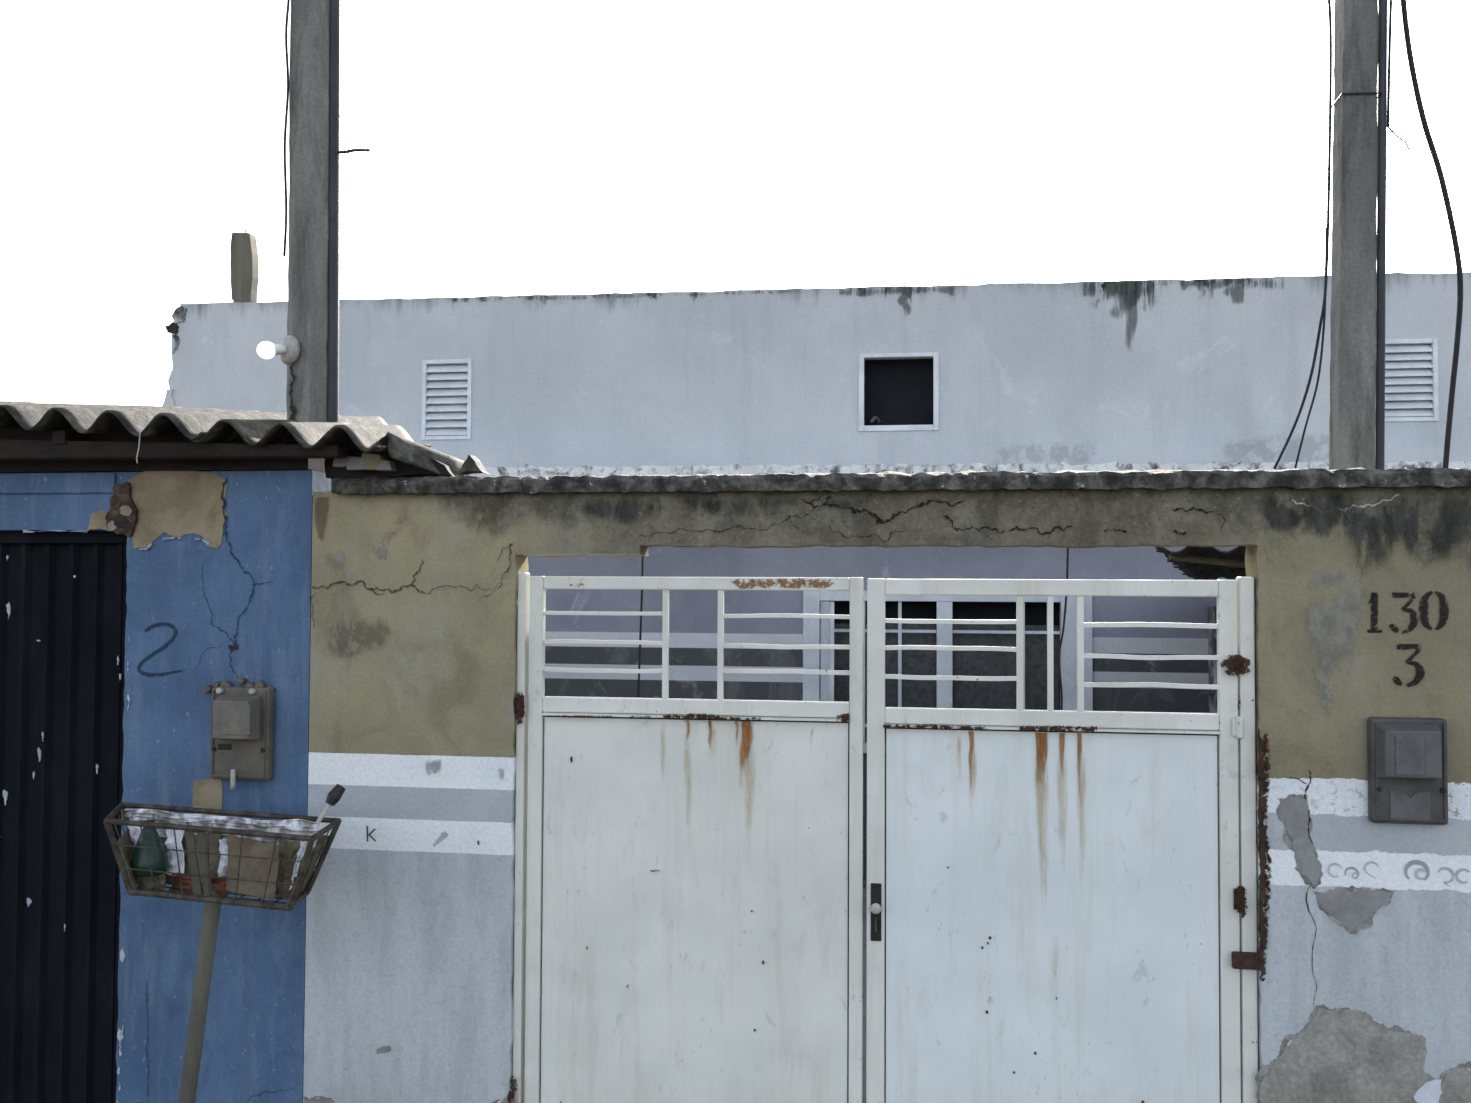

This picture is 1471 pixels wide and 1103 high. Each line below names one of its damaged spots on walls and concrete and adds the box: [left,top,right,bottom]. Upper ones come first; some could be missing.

water stain [1084,280,1154,342]
flaking render [23,471,228,550]
water stain [585,501,661,521]
crack [641,495,1127,542]
water stain [1264,495,1471,561]
crack [192,478,271,686]
crack [310,543,513,628]
rust [1220,654,1250,676]
rust [1019,726,1097,792]
rust [1239,728,1272,981]
flaking render [1276,793,1395,934]
flaking render [1255,1005,1471,1103]